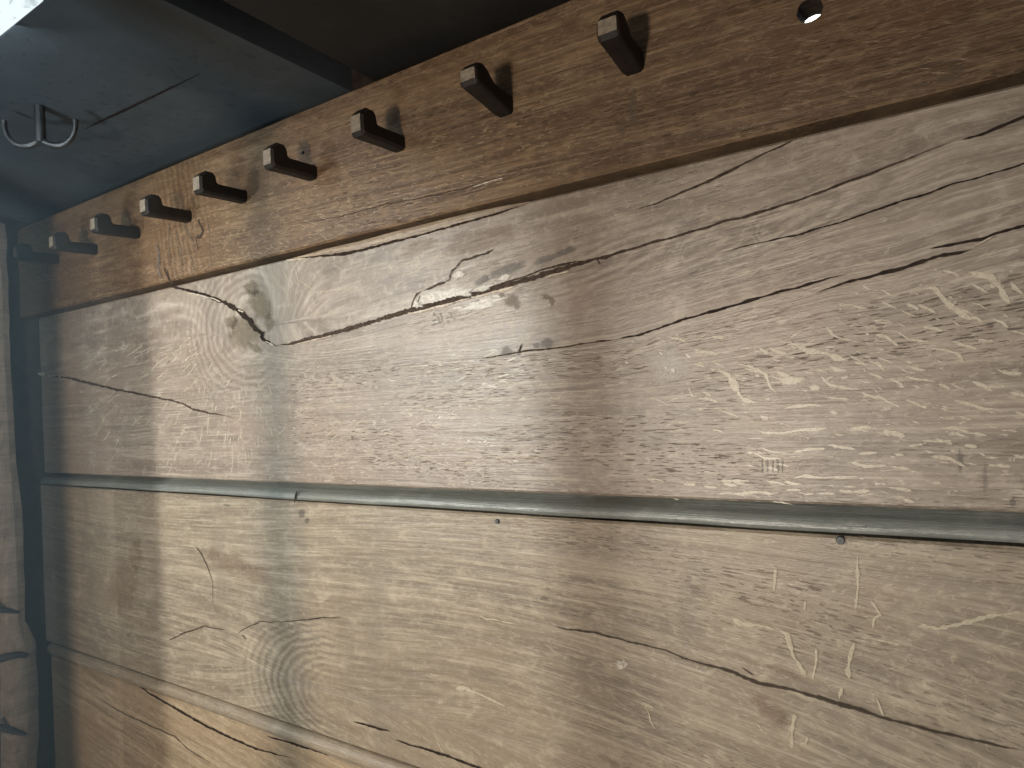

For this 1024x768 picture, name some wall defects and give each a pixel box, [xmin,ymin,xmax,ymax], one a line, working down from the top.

crack [163,115,1024,359]
crack [38,372,229,417]
crack [96,686,327,761]
crack [557,627,1018,750]